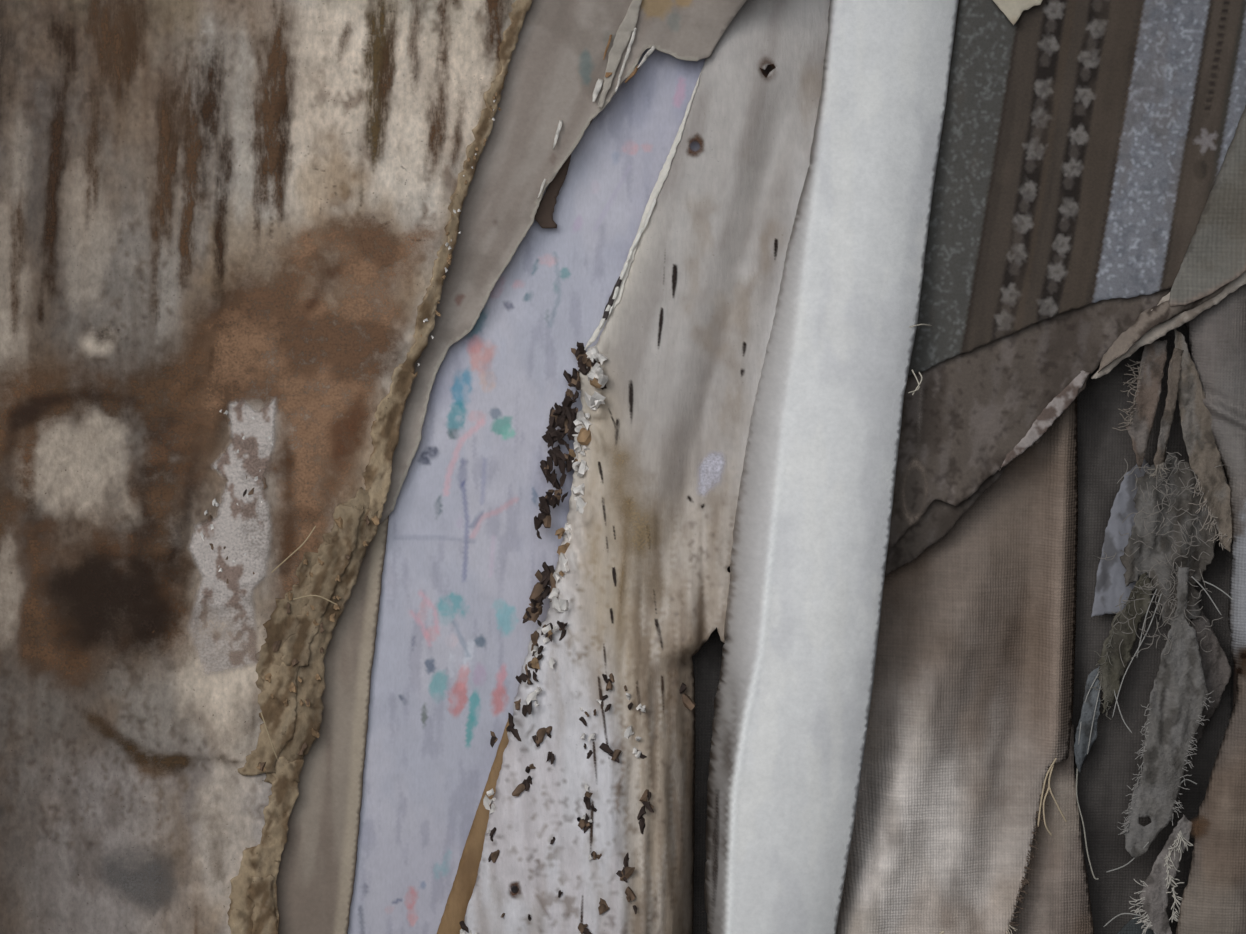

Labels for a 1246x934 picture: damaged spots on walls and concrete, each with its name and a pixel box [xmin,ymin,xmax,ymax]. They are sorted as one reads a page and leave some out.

damp [437,0,458,64]
damp [485,0,506,59]
damp [428,85,459,163]
damp [0,0,432,686]
peeling [190,0,532,934]
damp [88,715,191,773]